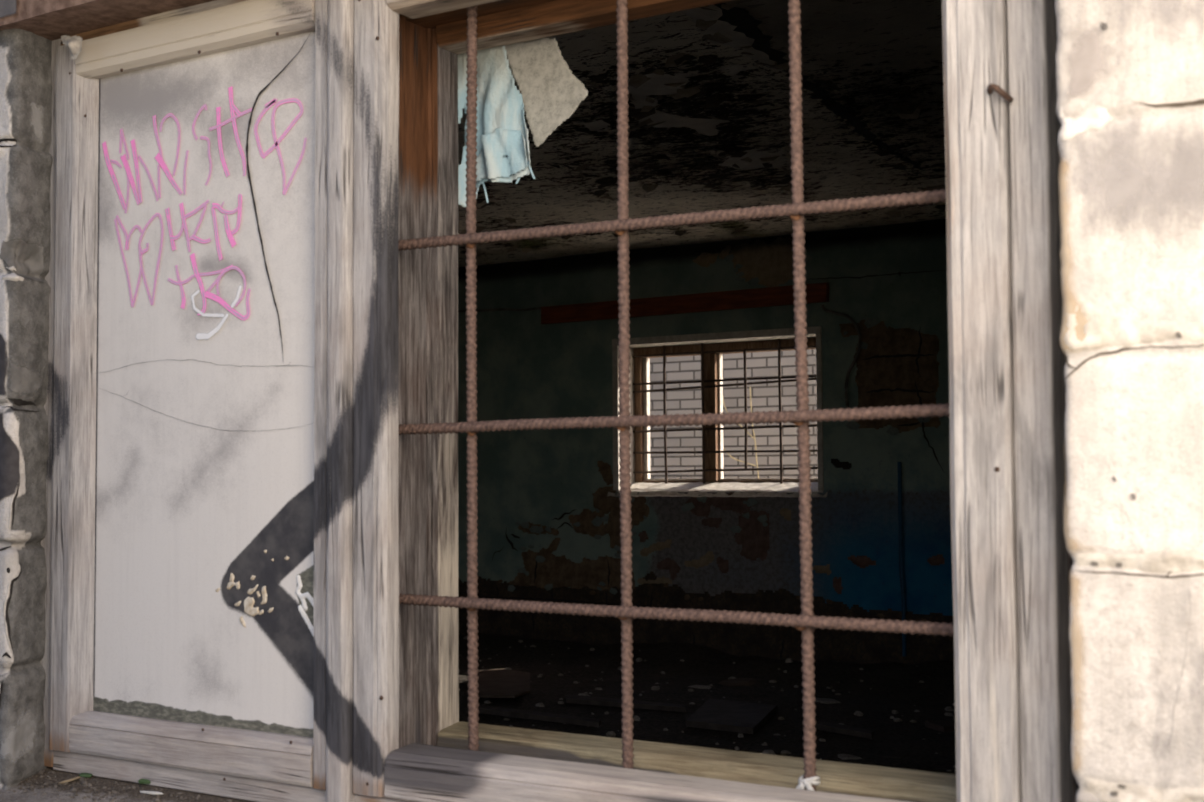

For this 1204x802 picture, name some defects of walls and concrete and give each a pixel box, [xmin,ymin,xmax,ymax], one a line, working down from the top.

leakage [458,219,947,277]
peeling [839,318,945,435]
peeling [458,461,954,664]